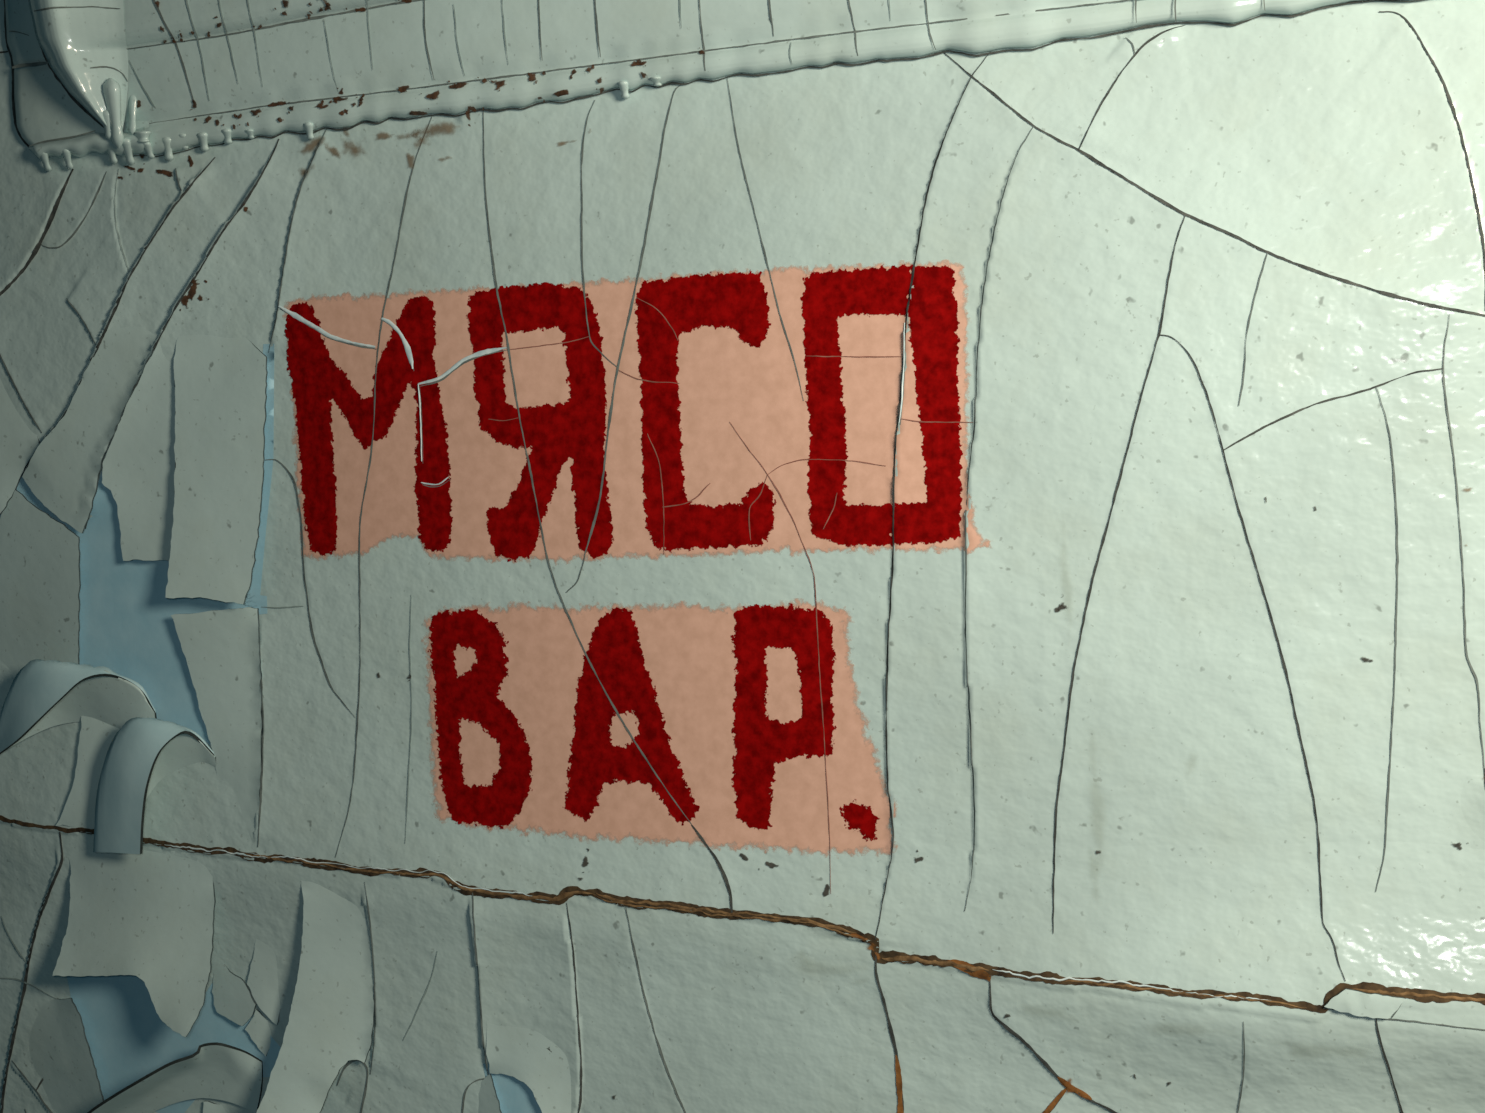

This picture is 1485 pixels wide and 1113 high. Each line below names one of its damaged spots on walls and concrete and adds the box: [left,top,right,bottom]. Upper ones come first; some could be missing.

crack [699,0,967,71]
corrosion [118,154,173,180]
corrosion [190,99,294,129]
corrosion [304,88,365,156]
corrosion [398,77,505,167]
corrosion [528,64,604,102]
crack [1379,11,1485,270]
crack [143,89,1485,1013]
peeling [0,322,375,1113]
crack [0,815,94,1113]
peeling [478,1020,571,1113]
crack [989,976,1117,1113]